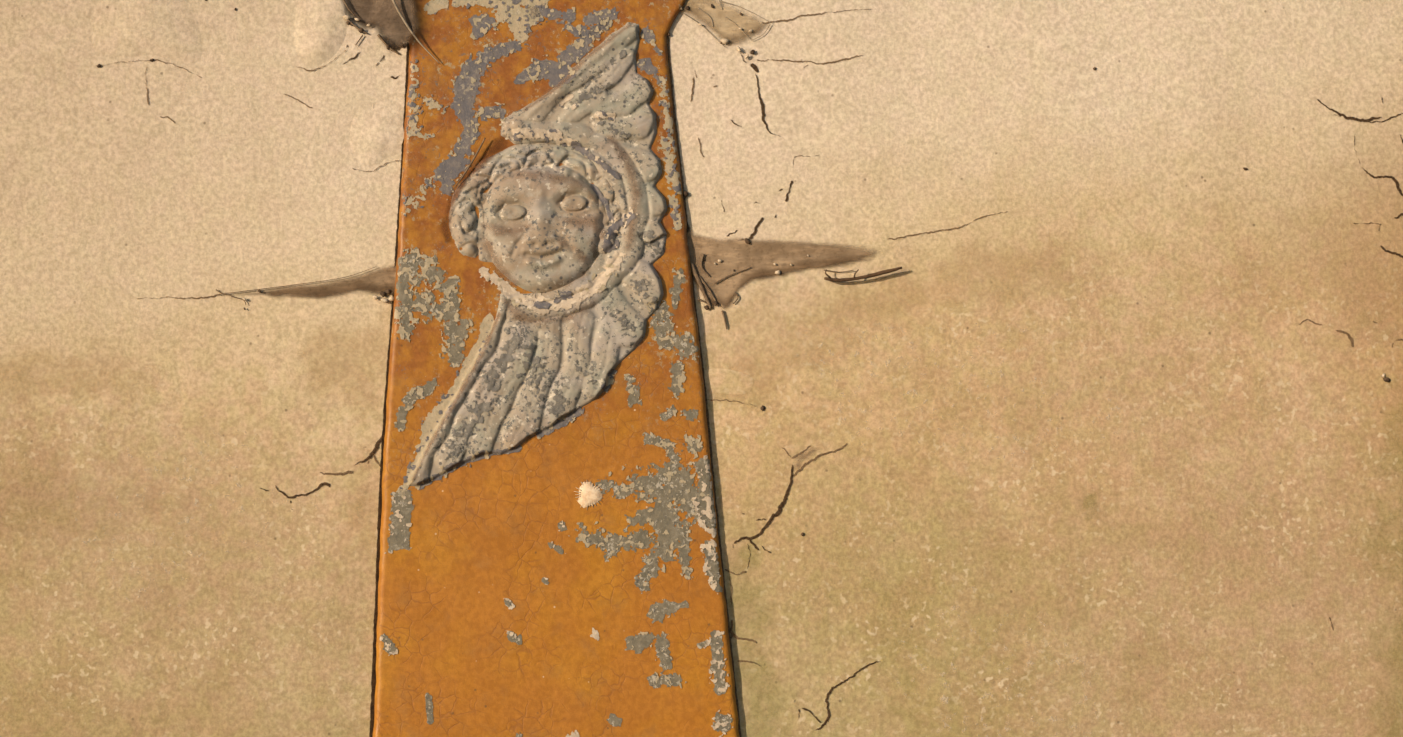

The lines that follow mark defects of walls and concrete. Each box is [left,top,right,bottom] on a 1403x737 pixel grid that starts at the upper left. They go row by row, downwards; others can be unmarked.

peeling [401,0,682,231]
crack [667,36,717,234]
crack [721,9,871,240]
crack [1317,98,1403,258]
crack [138,292,217,300]
crack [260,42,409,737]
peeling [384,184,723,689]
crack [692,277,847,737]
peeling [606,713,622,727]
crack [798,661,879,730]